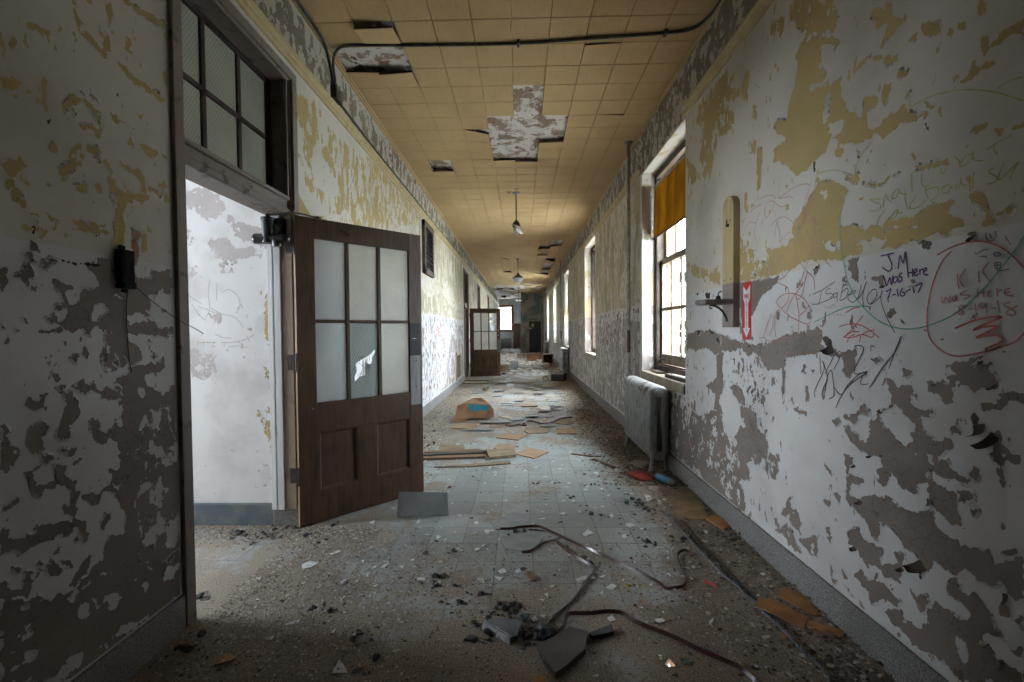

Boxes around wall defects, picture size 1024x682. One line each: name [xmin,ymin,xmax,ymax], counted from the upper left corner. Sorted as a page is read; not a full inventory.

peeling [17,0,168,103]
peeling [254,0,498,405]
peeling [544,0,758,413]
peeling [739,0,1024,322]
peeling [0,90,181,682]
peeling [257,406,271,453]
peeling [668,310,884,512]
peeling [774,495,832,557]
peeling [823,353,1024,682]